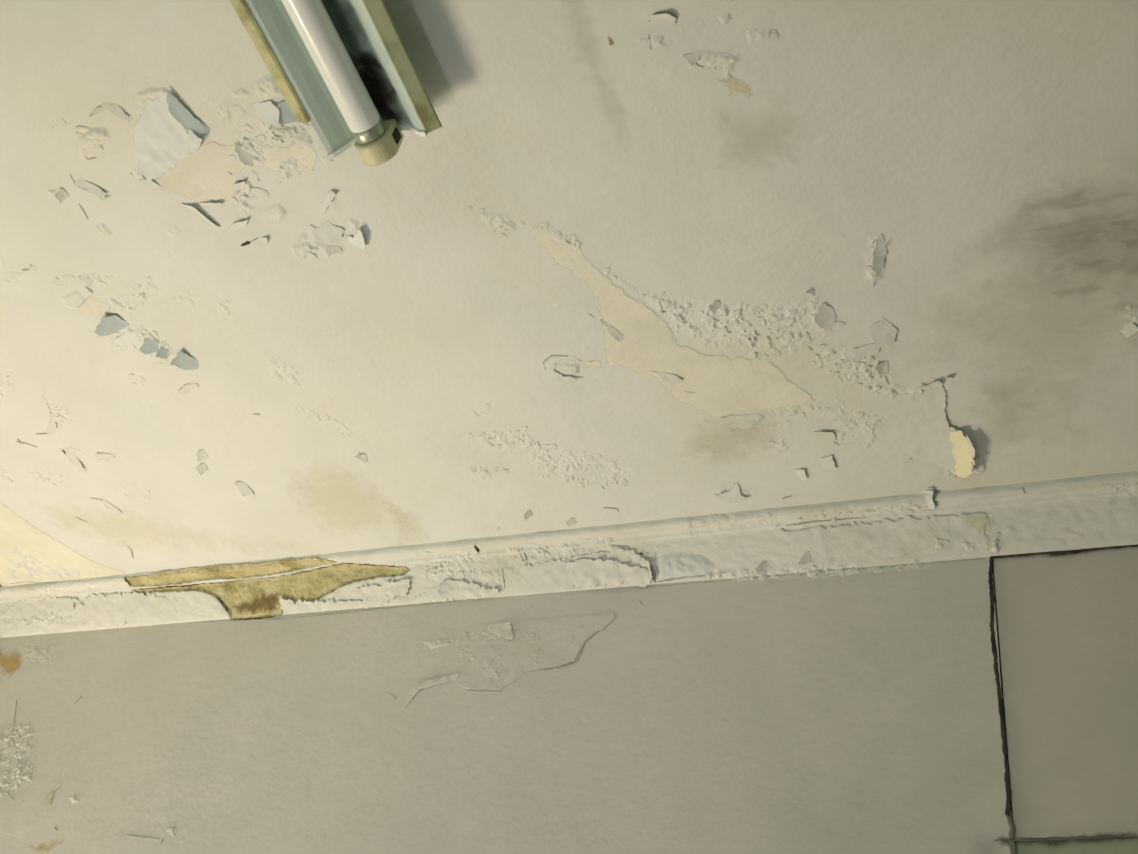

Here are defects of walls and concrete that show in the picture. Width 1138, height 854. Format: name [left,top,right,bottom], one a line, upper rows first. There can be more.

peeling [46,174,112,238]
peeling [128,74,366,261]
peeling [61,272,199,396]
peeling [543,355,583,383]
peeling [882,377,989,478]
peeling [0,503,716,621]
crack [644,485,1138,854]